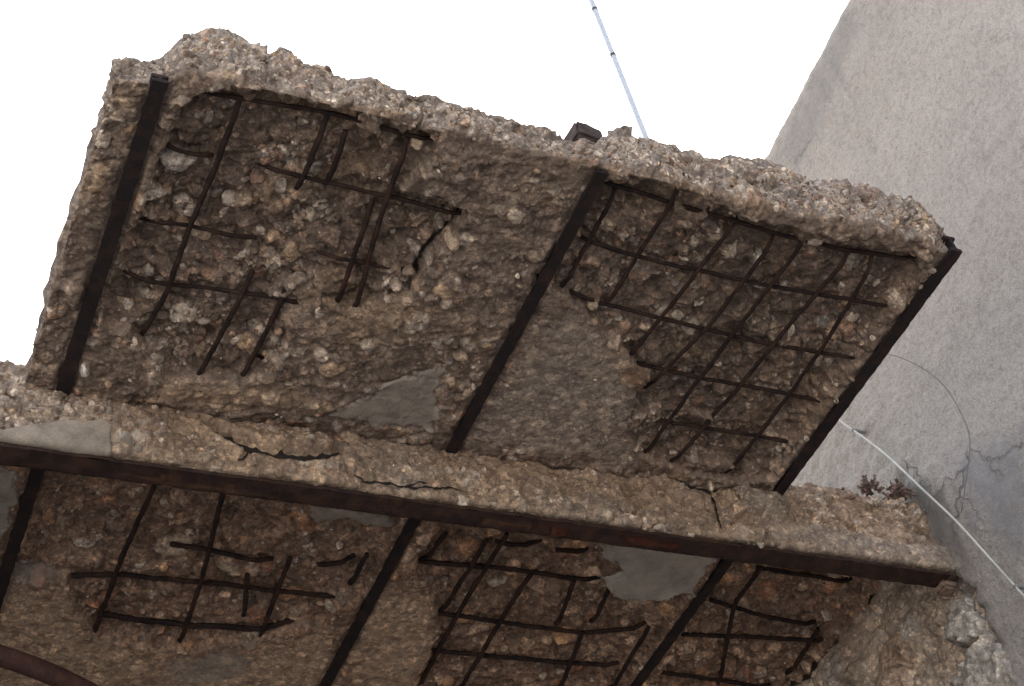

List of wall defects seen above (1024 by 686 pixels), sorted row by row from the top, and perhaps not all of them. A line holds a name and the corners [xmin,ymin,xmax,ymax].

spalling [96,85,473,388]
crack [404,196,459,283]
spalling [532,173,938,486]
spalling [11,467,408,656]
crack [213,431,465,492]
crack [686,485,722,529]
spalling [413,522,1017,686]